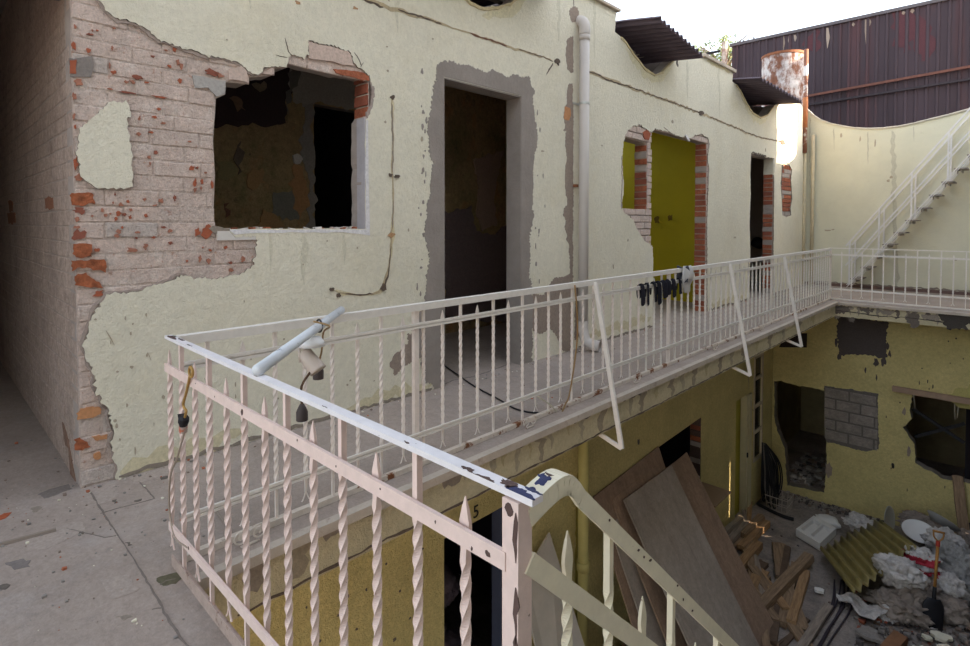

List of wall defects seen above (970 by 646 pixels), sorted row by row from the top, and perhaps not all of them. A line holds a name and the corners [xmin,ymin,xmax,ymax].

crack [364,0,441,24]
crack [471,33,553,62]
crack [590,71,780,142]
spalling [69,0,375,488]
spalling [621,124,709,311]
spalling [781,162,791,217]